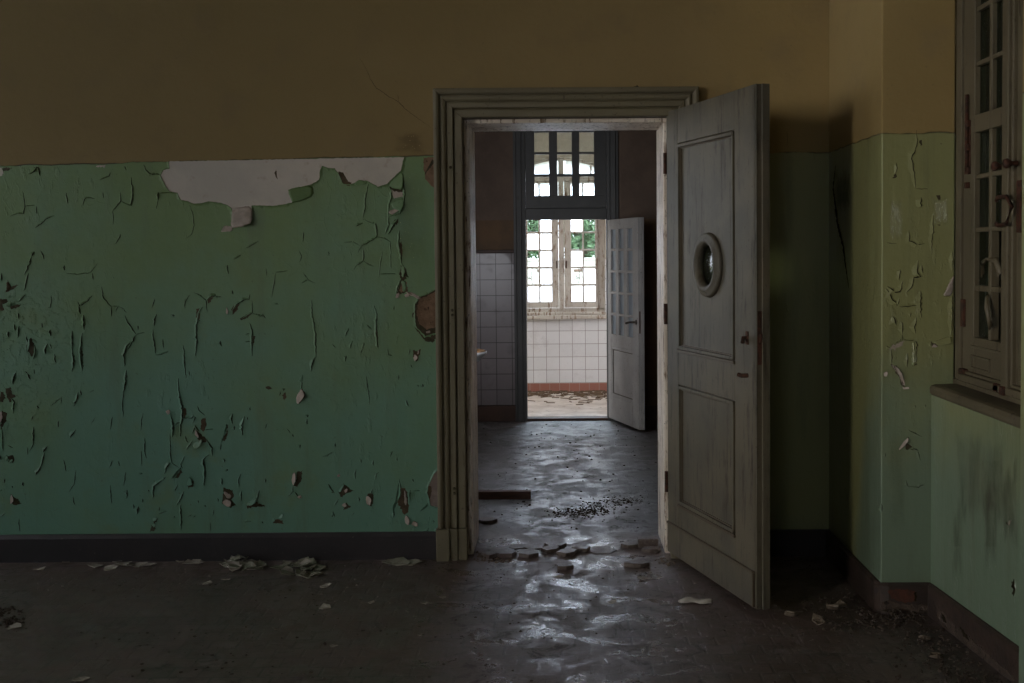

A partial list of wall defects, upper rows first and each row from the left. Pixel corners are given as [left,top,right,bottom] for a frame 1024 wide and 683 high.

peeling [0,273,37,463]
crack [11,165,228,531]
peeling [159,157,436,368]
crack [265,232,409,406]
crack [327,184,395,275]
crack [832,165,849,288]
peeling [166,378,235,491]
peeling [217,474,283,524]
peeling [328,474,373,517]
peeling [392,468,438,527]